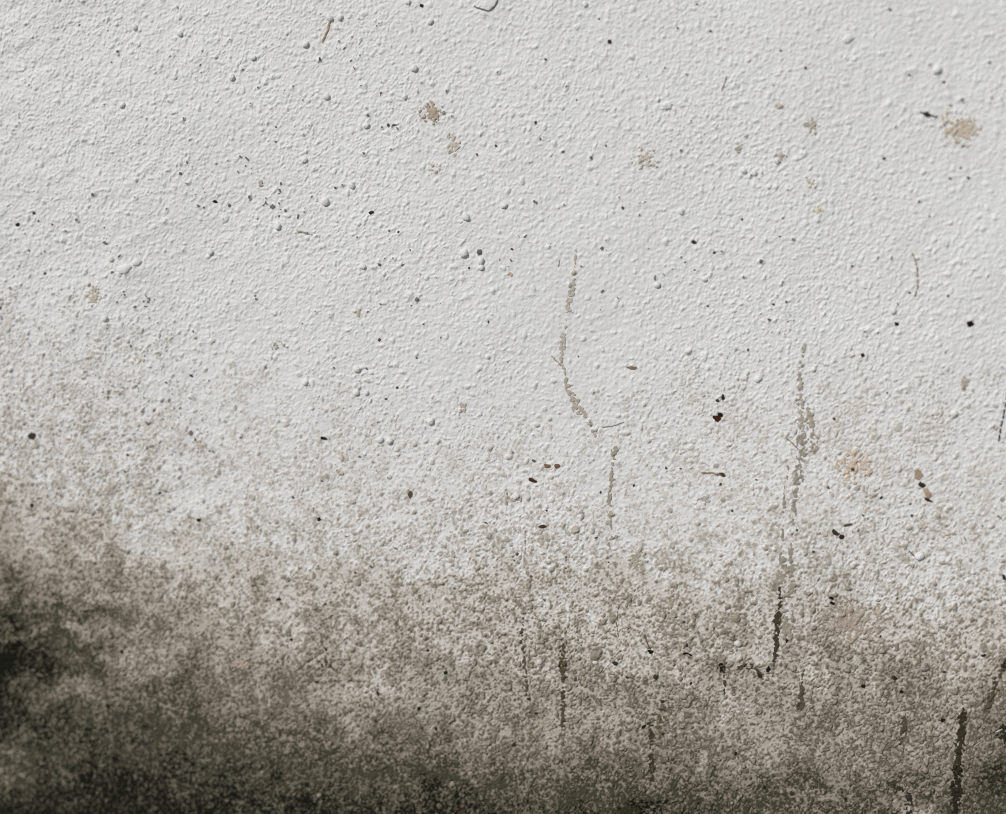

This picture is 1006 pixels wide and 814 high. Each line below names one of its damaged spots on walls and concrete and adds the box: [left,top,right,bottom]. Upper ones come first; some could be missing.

water stain [0,343,1006,814]